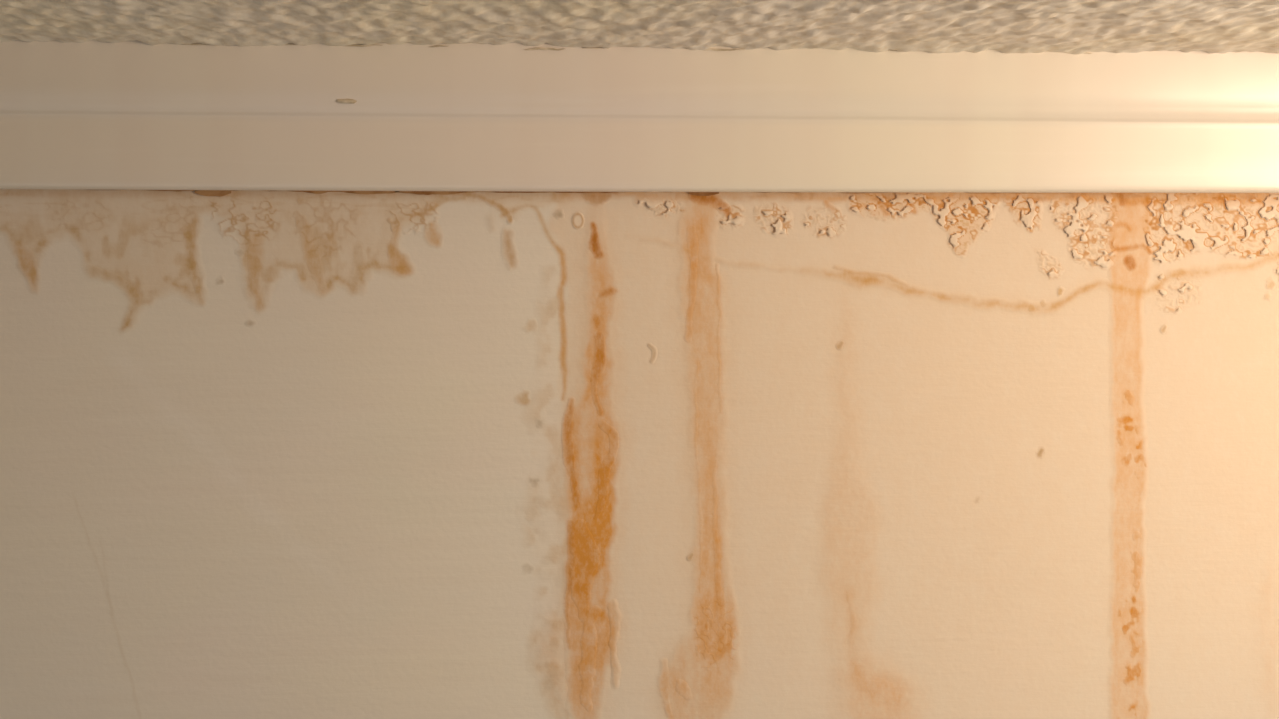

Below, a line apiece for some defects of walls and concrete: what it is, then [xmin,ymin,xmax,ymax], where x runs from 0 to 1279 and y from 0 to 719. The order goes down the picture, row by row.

leakage [0,189,588,719]
leakage [606,199,690,719]
leakage [714,201,1112,719]
leakage [1142,250,1279,719]